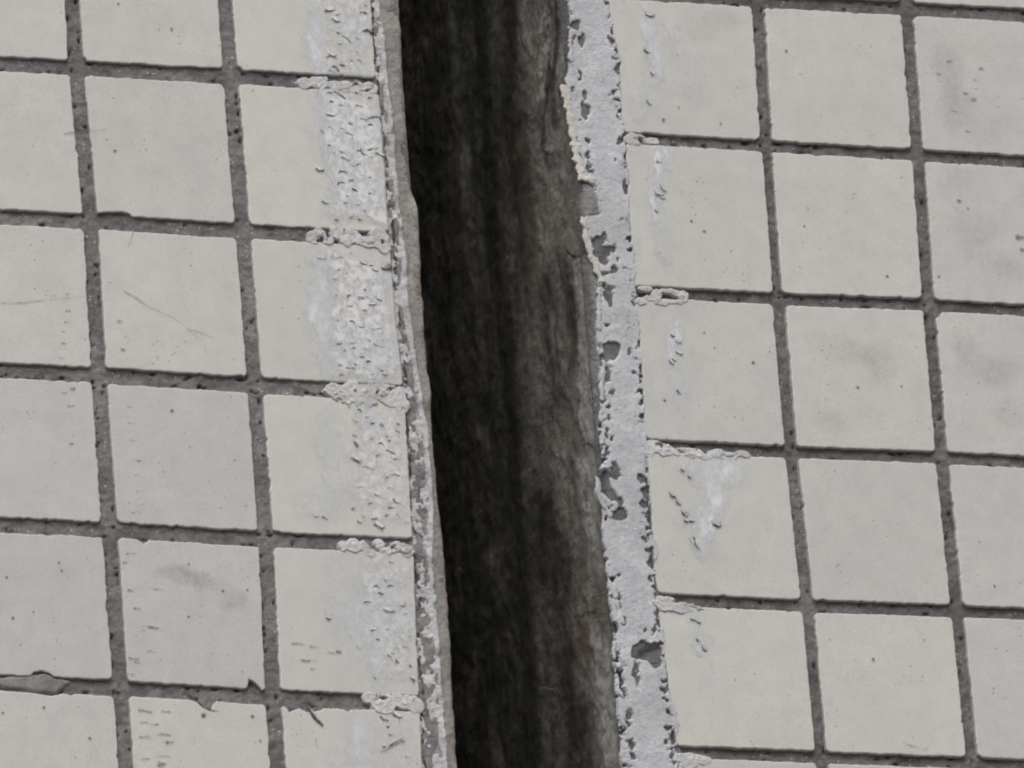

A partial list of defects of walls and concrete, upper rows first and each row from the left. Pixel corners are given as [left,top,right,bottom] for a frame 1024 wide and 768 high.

peeling [316,0,448,768]
crack [363,5,416,534]
crack [414,562,422,607]
crack [417,632,426,768]
peeling [533,0,680,768]